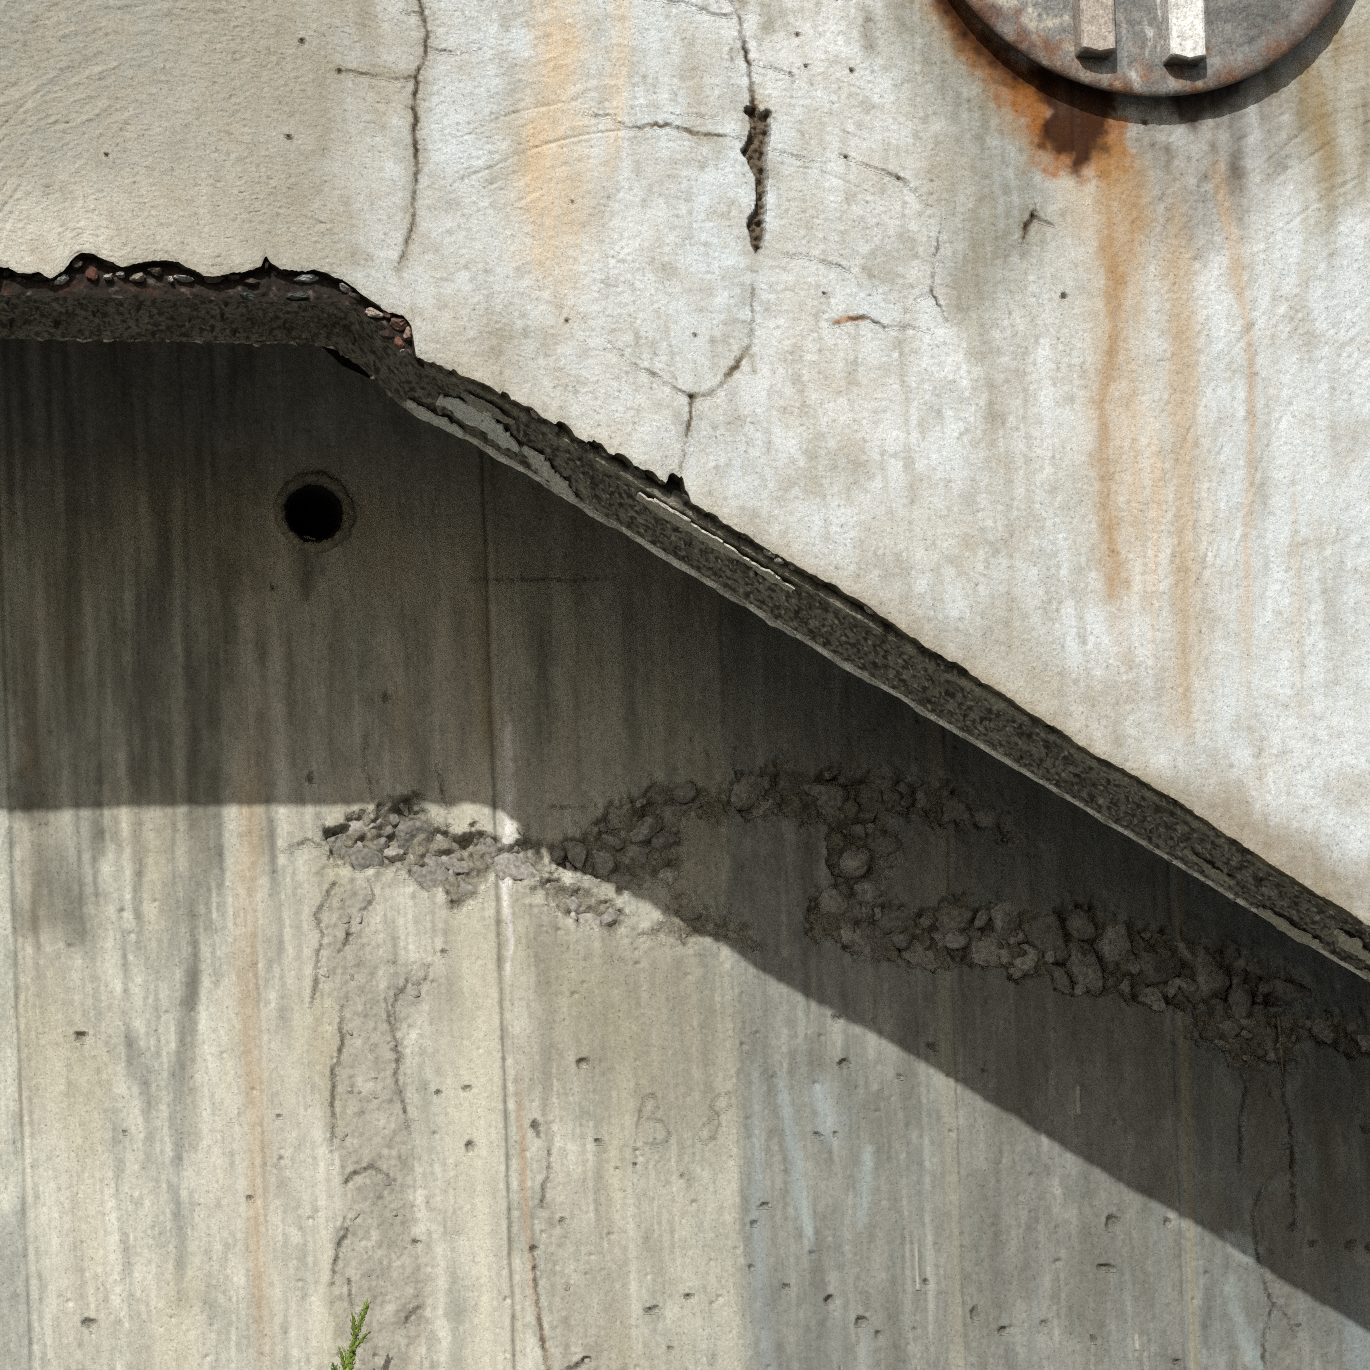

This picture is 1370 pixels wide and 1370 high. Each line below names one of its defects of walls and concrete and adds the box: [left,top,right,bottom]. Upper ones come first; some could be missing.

crack [335,0,483,276]
crack [583,0,951,334]
crack [1018,199,1057,247]
crack [603,283,757,473]
rust [904,0,1262,755]
water stain [398,571,476,814]
water stain [497,590,562,844]
water stain [610,587,657,757]
spalling [0,253,1370,980]
rust [1287,456,1307,695]
water stain [0,338,372,1370]
crack [531,1255,591,1370]